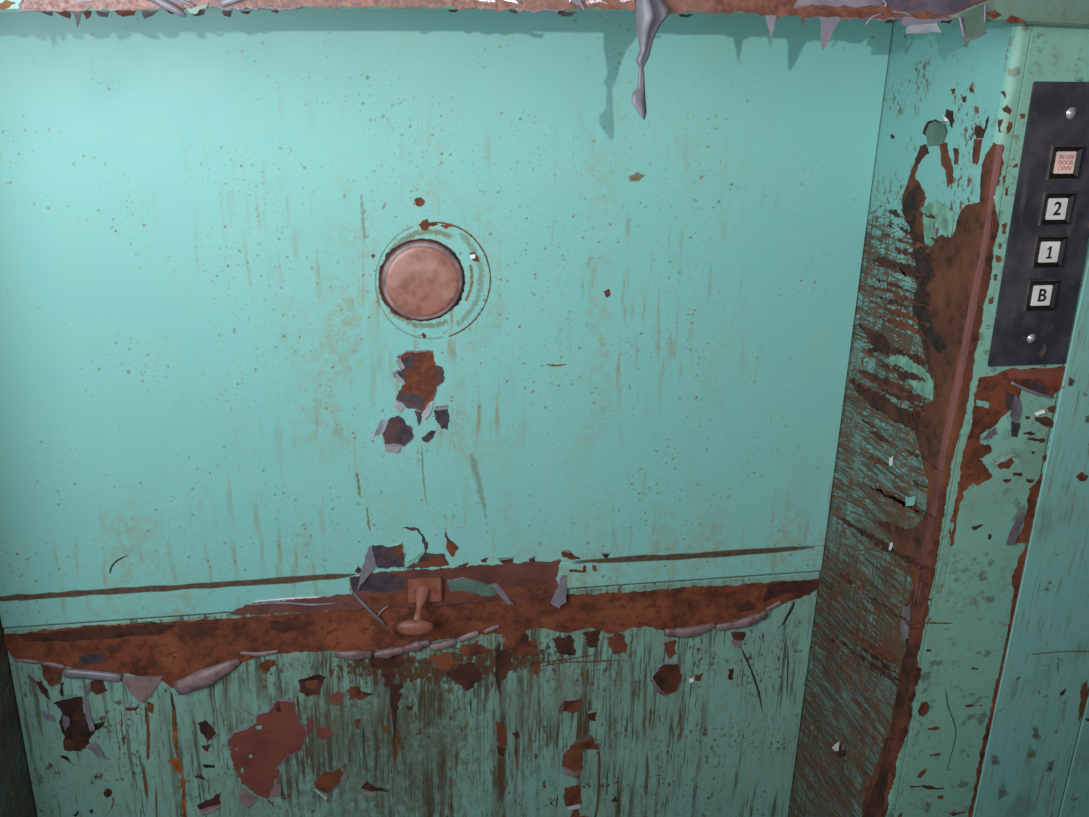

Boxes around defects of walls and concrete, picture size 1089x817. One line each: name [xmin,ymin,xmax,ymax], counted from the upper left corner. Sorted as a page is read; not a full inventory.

peeling [18,0,987,120]
rust [993,222,1007,281]
peeling [369,349,450,453]
peeling [830,91,1074,817]
rust [0,574,353,601]
rust [575,546,812,563]
peeling [194,674,347,809]
rust [258,659,287,674]
peeling [3,527,820,765]
rust [311,628,628,760]
peeling [562,735,600,817]
rust [910,768,944,799]